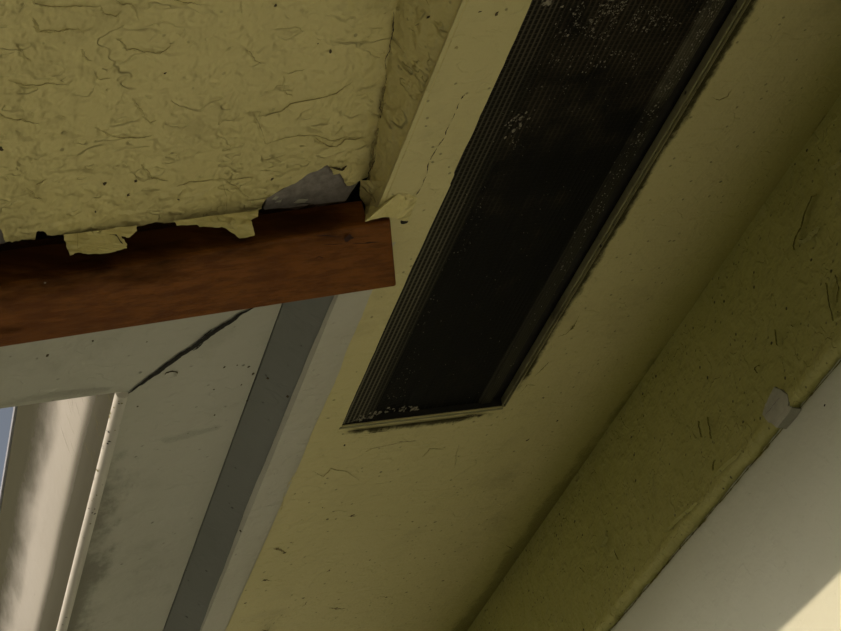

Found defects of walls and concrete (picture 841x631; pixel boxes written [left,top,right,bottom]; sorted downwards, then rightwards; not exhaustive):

spalling [174,160,418,238]
peeling [63,226,137,256]
crack [128,308,253,394]
spalling [762,387,801,429]